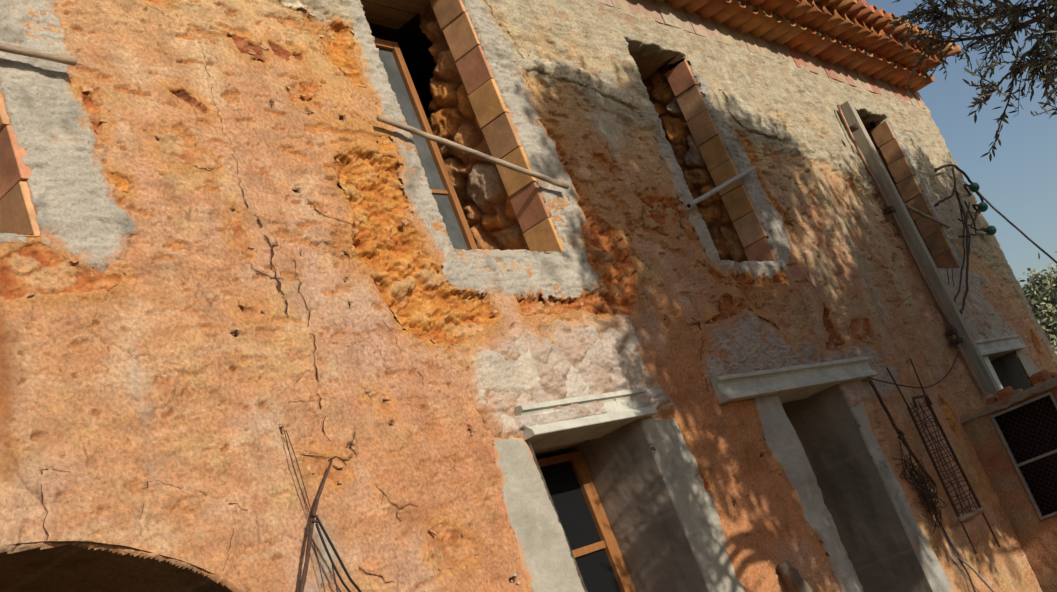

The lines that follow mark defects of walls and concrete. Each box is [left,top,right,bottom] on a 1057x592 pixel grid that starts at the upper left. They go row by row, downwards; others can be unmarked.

crack [202,49,356,465]
spalling [334,135,502,346]
spalling [517,117,695,316]